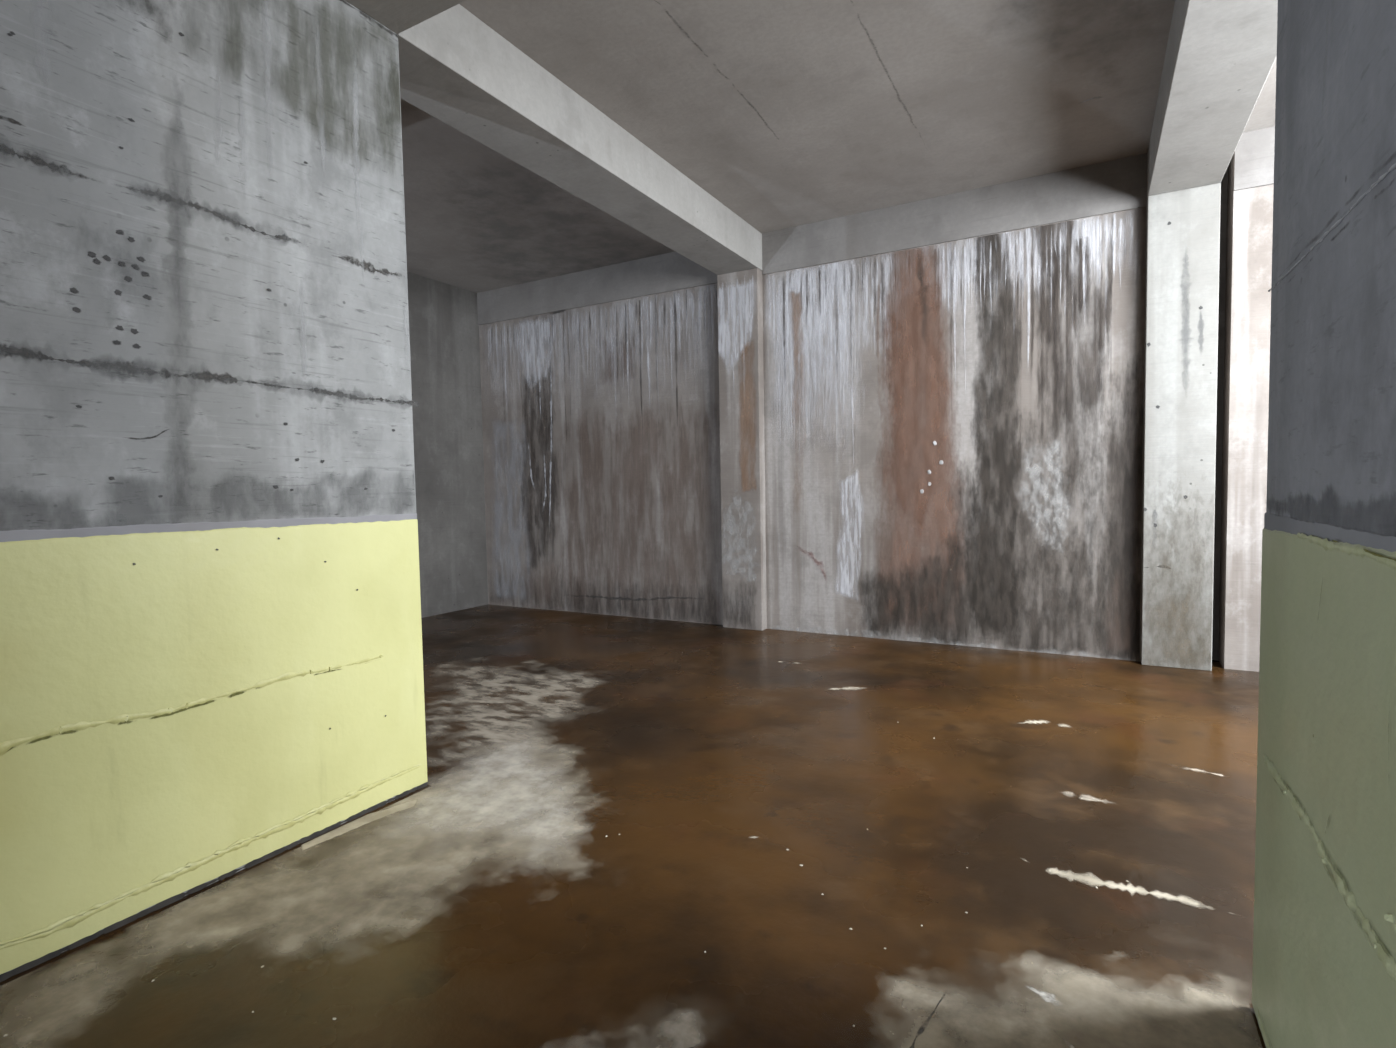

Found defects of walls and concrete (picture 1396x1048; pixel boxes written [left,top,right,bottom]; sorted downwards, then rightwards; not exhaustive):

leakage [285,16,361,139]
crack [1268,163,1396,292]
leakage [718,281,753,363]
leakage [770,259,897,374]
leakage [496,318,593,565]
corrosion [880,248,965,625]
leakage [841,218,1212,669]
peeling [1297,533,1396,570]
leakage [145,665,596,951]
leakage [1050,869,1198,905]
crack [910,994,945,1048]
leakage [895,973,1256,1048]